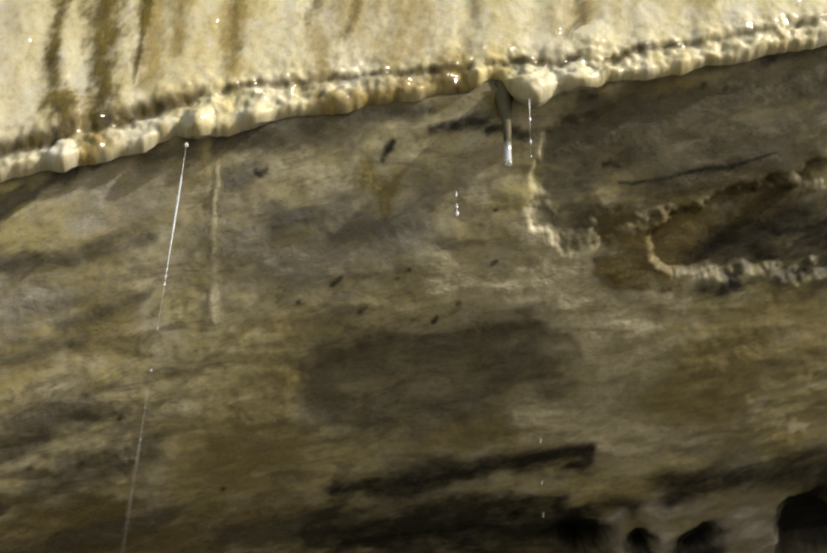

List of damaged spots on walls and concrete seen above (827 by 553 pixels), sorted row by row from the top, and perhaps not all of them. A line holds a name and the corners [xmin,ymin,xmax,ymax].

damp [209,157,431,325]
damp [0,0,827,228]
crack [602,153,774,185]
damp [0,194,827,553]